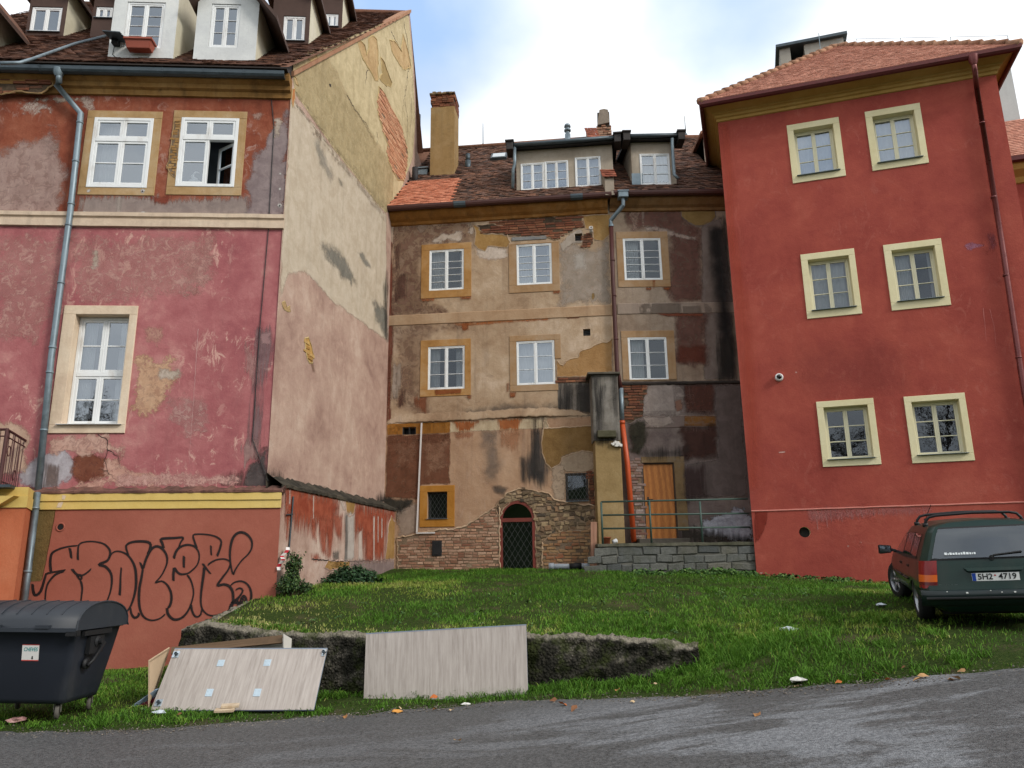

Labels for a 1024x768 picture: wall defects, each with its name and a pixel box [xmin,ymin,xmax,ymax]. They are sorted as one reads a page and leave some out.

peeling [24,97,94,114]
flaking render [358,34,411,181]
water stain [325,248,353,283]
flaking render [416,214,611,269]
flaking render [555,338,613,383]
peeling [129,354,206,438]
peeling [0,422,30,474]
peeling [50,433,239,487]
water stain [450,407,548,482]
flaking render [373,421,595,571]